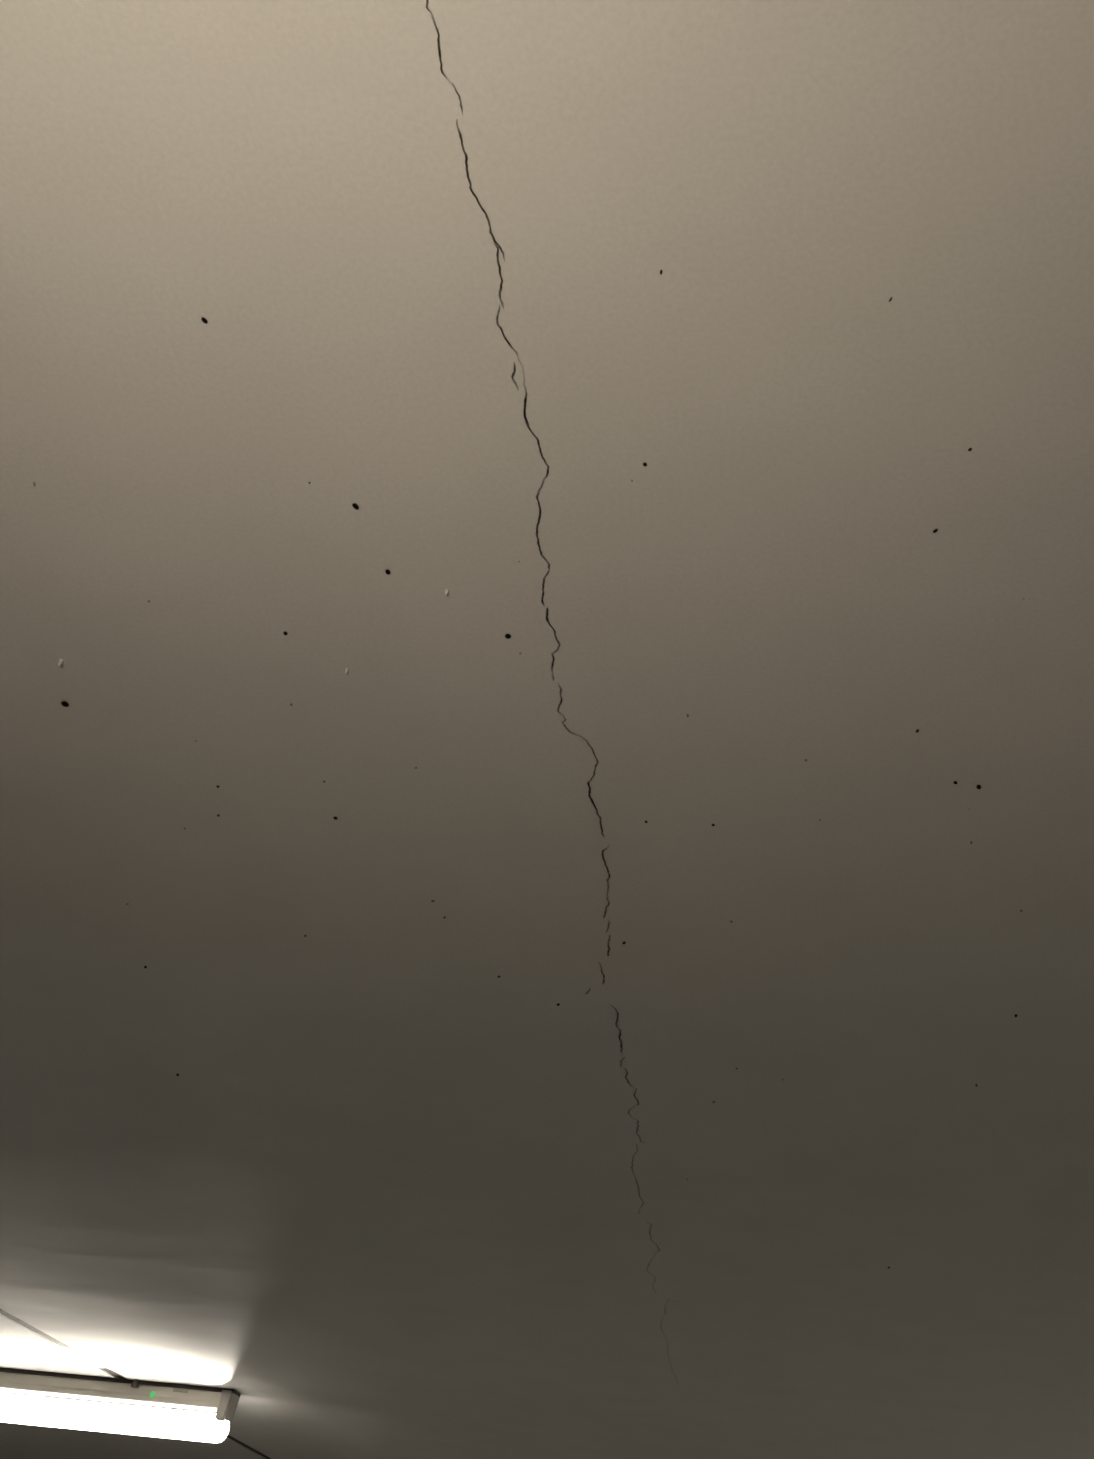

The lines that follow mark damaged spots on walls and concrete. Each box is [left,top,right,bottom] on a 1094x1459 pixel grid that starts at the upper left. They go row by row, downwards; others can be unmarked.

crack [426,0,660,1251]